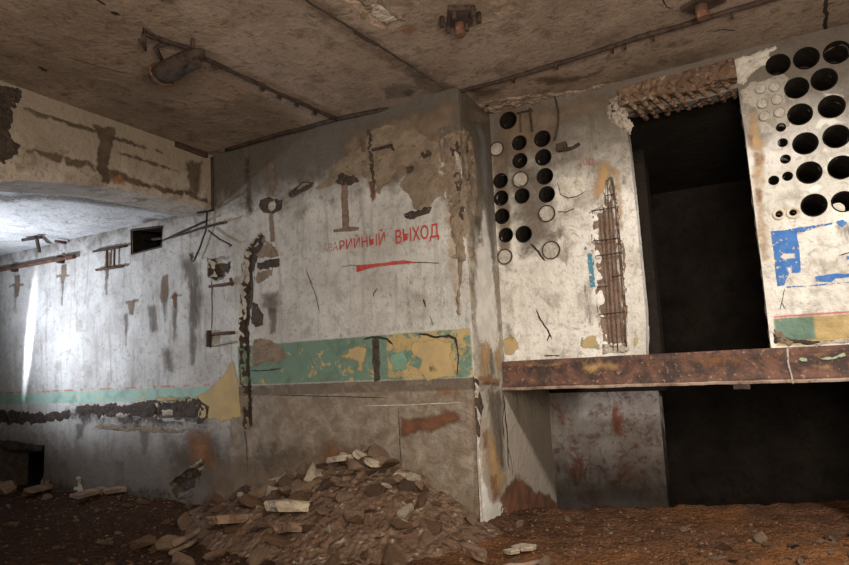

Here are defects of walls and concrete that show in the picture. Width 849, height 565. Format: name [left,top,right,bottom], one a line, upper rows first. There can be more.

spalling [0,85,22,164]
spalling [607,95,634,134]
spalling [581,177,638,355]
spalling [0,124,519,522]
rust [585,362,617,371]
rust [401,412,459,436]
rust [479,375,557,514]